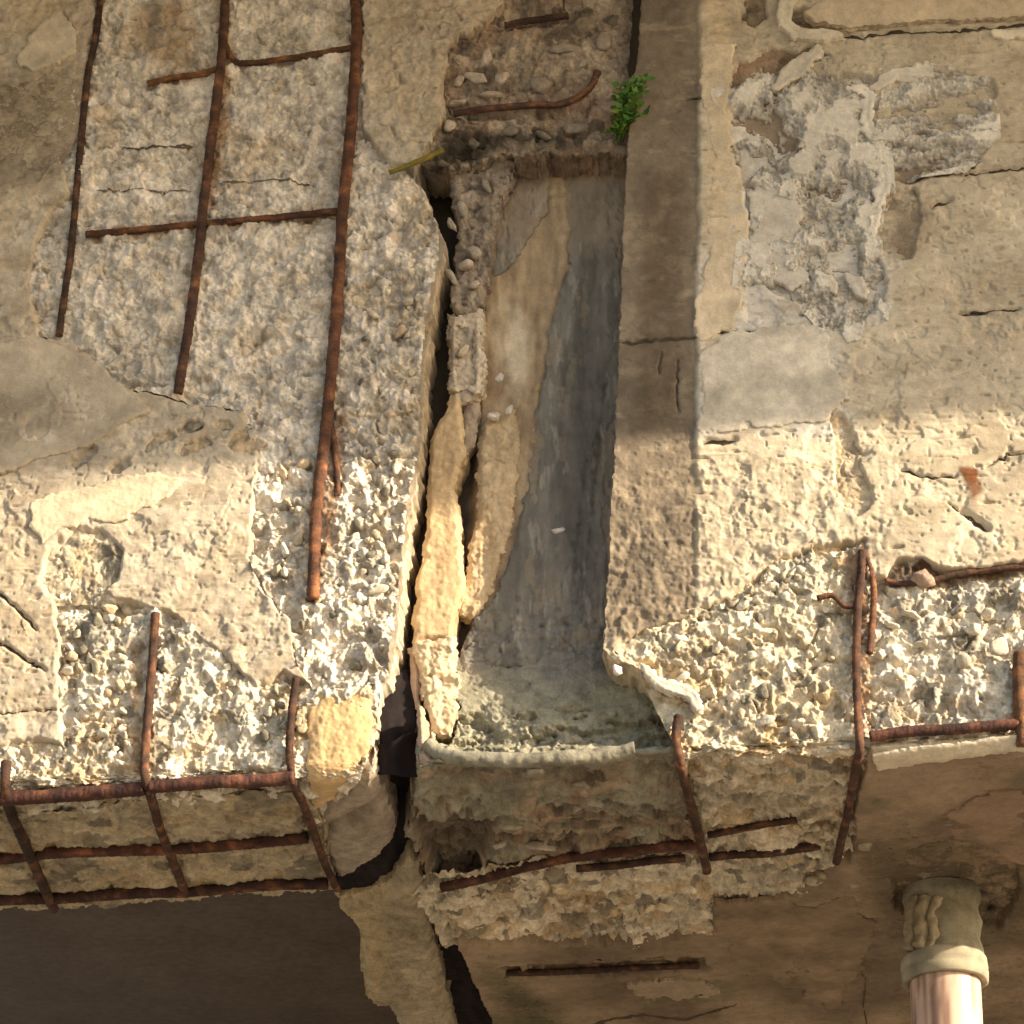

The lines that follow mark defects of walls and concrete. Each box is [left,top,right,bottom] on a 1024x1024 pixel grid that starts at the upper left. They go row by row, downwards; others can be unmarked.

crack [122,142,193,150]
crack [97,188,191,196]
crack [218,178,315,187]
leakage [549,175,571,266]
spalling [0,0,440,914]
spalling [403,0,1024,948]
corrosion [890,559,1017,587]
crack [0,593,43,669]
crack [0,708,56,716]